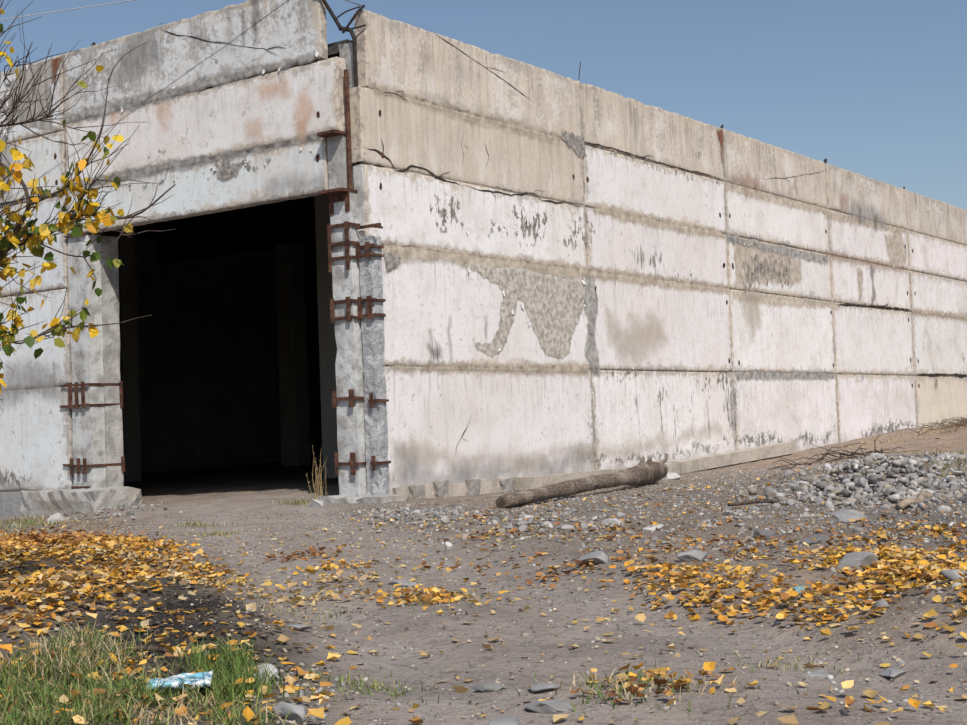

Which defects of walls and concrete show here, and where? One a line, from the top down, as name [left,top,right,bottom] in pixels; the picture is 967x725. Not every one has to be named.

crack [431,30,534,102]
spalling [374,87,587,158]
crack [367,134,583,207]
peeling [430,192,468,234]
peeling [631,154,907,268]
flaking render [384,205,841,381]